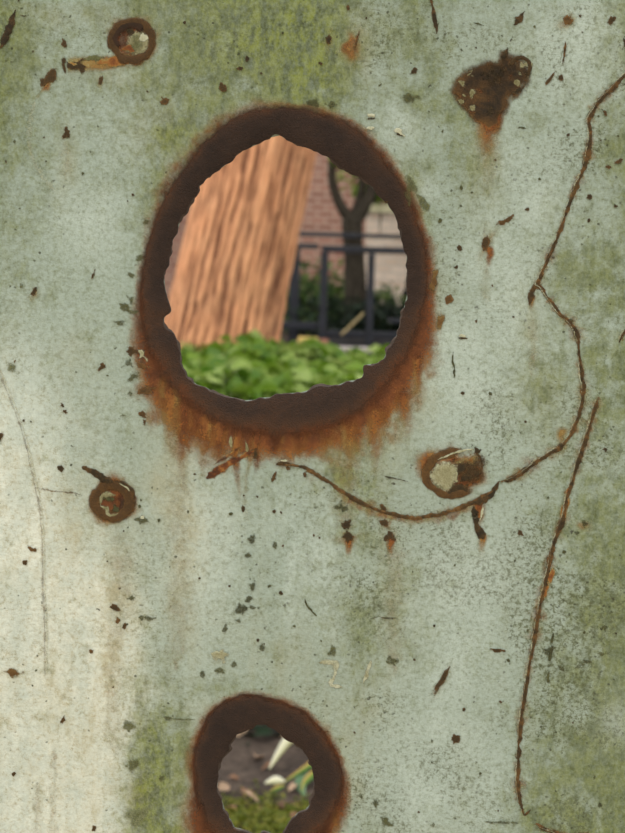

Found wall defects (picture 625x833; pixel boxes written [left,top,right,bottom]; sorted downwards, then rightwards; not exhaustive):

rust [40,18,156,90]
rust [451,38,533,152]
rust [133,103,437,479]
rust [82,466,136,525]
crack [271,73,625,833]
rust [417,447,487,499]
rust [185,693,349,833]